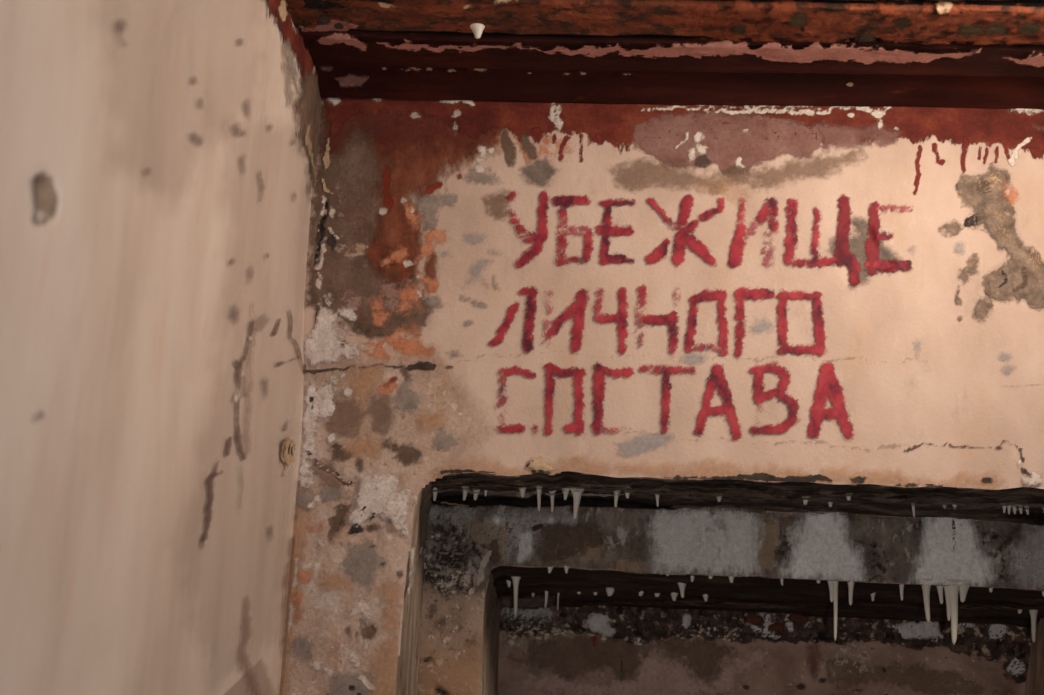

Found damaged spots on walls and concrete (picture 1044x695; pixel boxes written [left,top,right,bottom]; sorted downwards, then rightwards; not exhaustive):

peeling [262,0,1044,322]
spalling [36,171,58,225]
crack [202,138,452,546]
spalling [526,457,556,474]
crack [904,440,1030,478]
spalling [1021,469,1042,487]
peeling [283,357,492,695]
efflorescence [648,507,760,577]
efflorescence [780,511,865,581]
efflorescence [915,517,994,587]
spalling [499,605,1032,695]